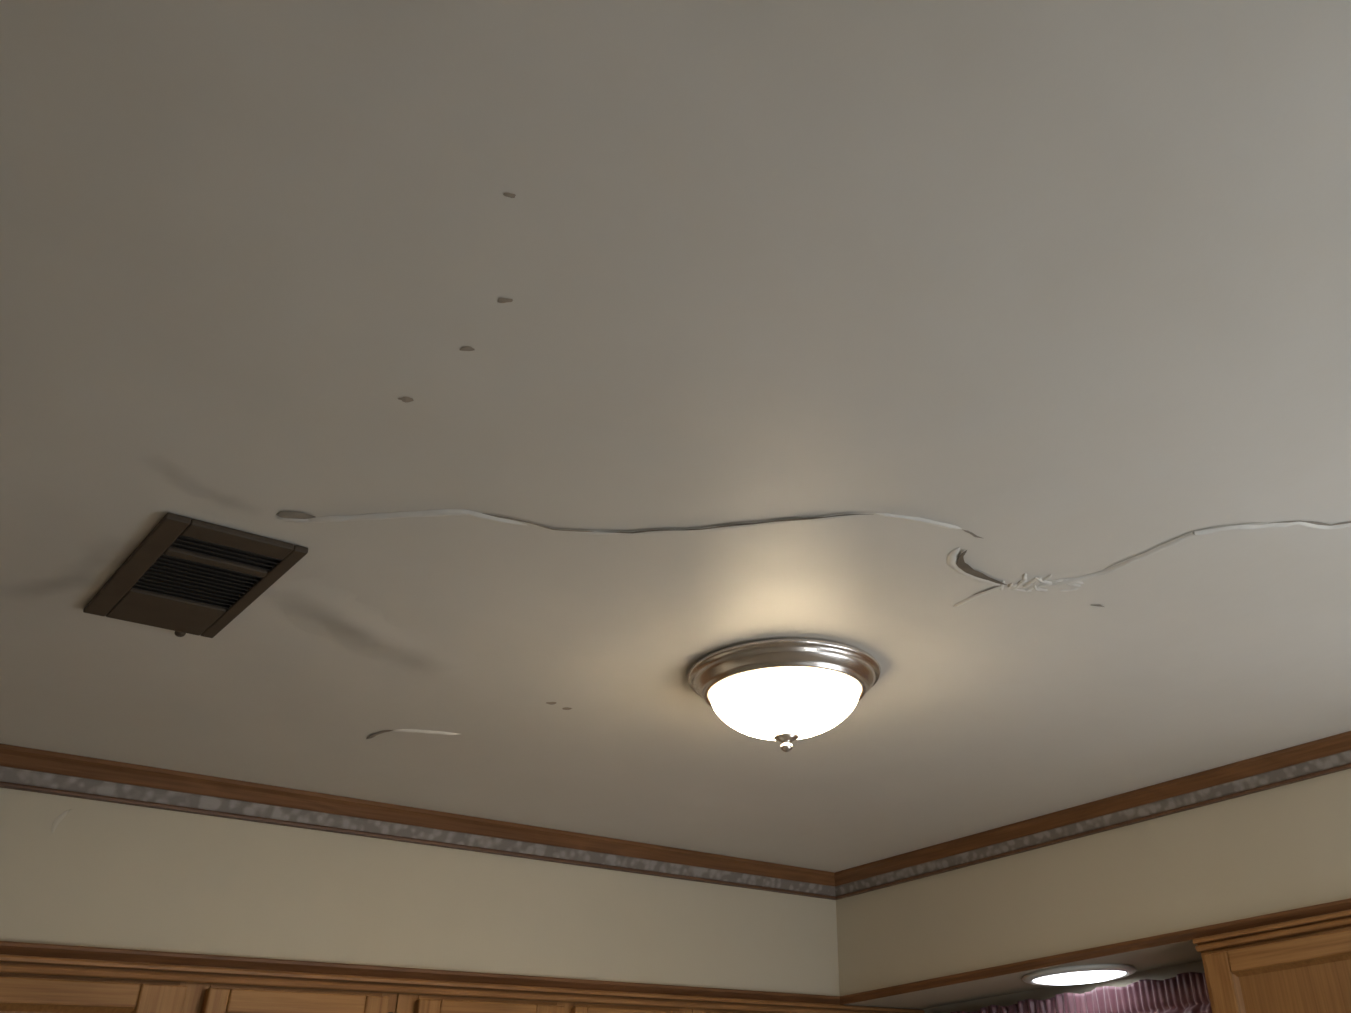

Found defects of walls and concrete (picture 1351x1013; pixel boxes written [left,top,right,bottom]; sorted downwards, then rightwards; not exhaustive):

crack [295,509,1007,607]
crack [1051,521,1351,586]
crack [366,729,459,739]